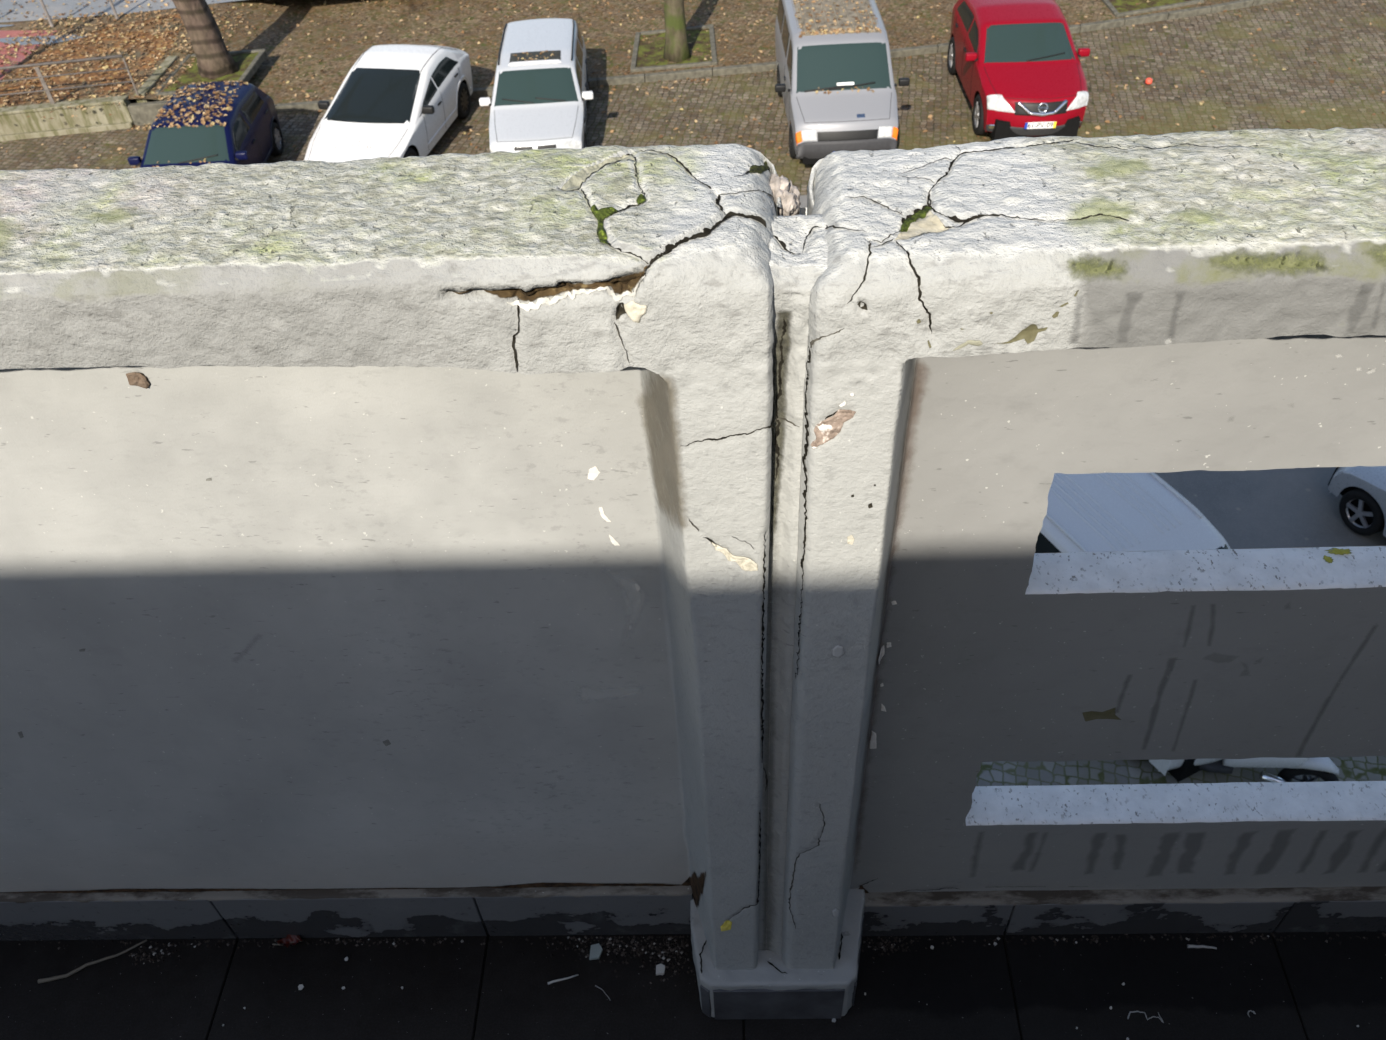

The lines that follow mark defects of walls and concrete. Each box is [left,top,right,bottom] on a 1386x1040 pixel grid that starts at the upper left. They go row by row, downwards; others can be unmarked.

spalling [734,161,801,216]
crack [512,298,520,373]
spalling [811,393,856,449]
spalling [689,520,758,571]
crack [559,136,1270,973]